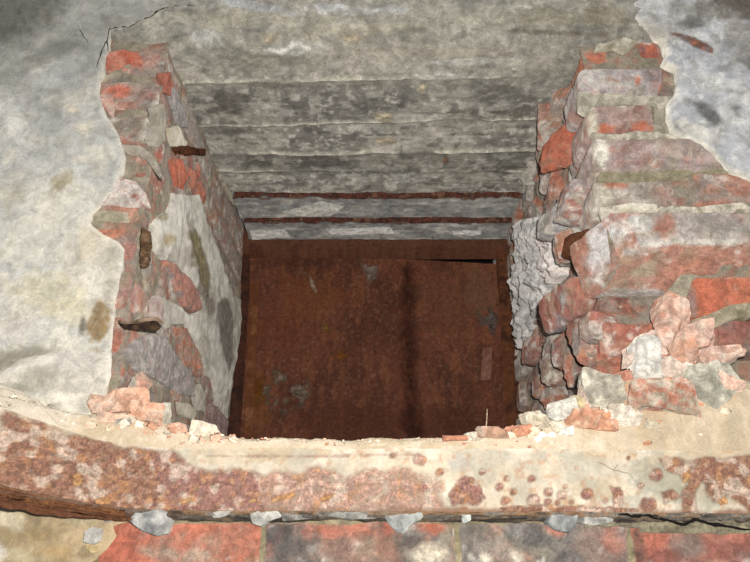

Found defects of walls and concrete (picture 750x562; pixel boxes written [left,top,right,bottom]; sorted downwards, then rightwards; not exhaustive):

crack [79,5,196,67]
spalling [672,33,713,53]
peeling [93,49,242,420]
rust [233,191,521,200]
rust [244,217,512,225]
spalling [506,37,750,425]
rust [0,412,750,535]
crack [618,513,750,530]